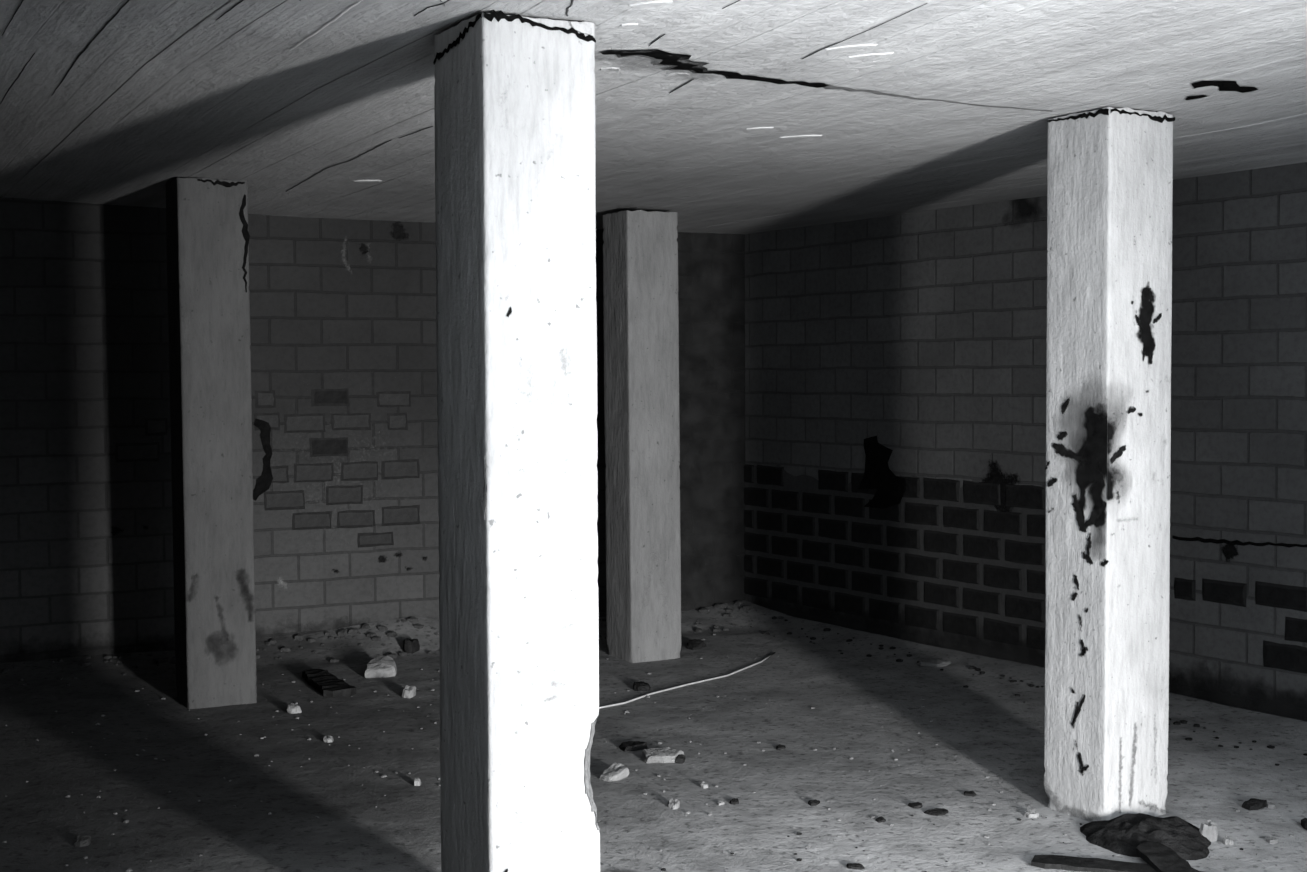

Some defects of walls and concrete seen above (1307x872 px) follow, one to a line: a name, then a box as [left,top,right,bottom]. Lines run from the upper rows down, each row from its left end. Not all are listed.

crack [414,0,1259,123]
crack [286,126,433,192]
crack [198,179,250,292]
peeling [254,388,420,571]
leakage [1083,533,1109,566]
leakage [1072,575,1088,657]
spalling [584,719,600,830]
leakage [1071,688,1089,776]